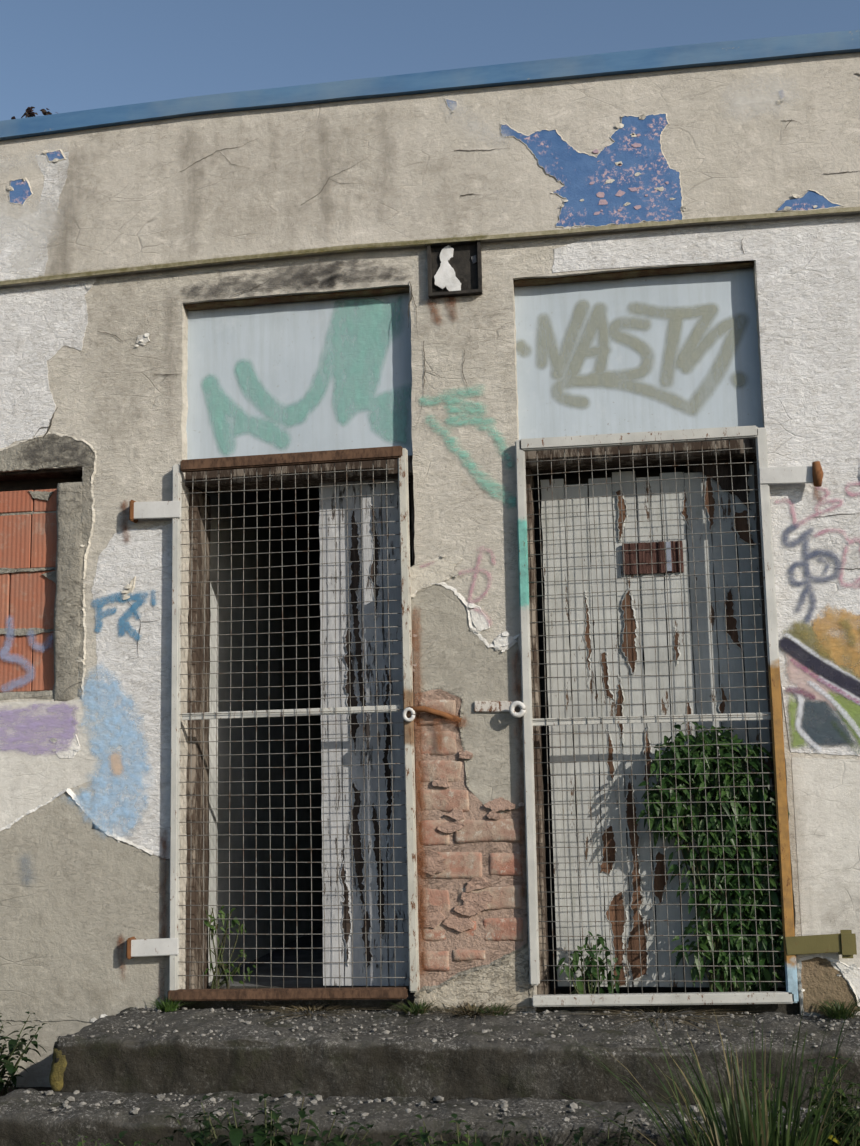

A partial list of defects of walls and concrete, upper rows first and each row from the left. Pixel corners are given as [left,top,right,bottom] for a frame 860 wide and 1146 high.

peeling [6,178,33,206]
spalling [42,149,66,163]
crack [180,138,258,172]
peeling [500,113,686,230]
peeling [776,189,844,212]
spalling [0,432,97,700]
peeling [344,505,380,749]
peeling [49,734,81,759]
spalling [410,554,535,1013]
peeling [340,665,392,967]
spalling [797,954,860,1016]